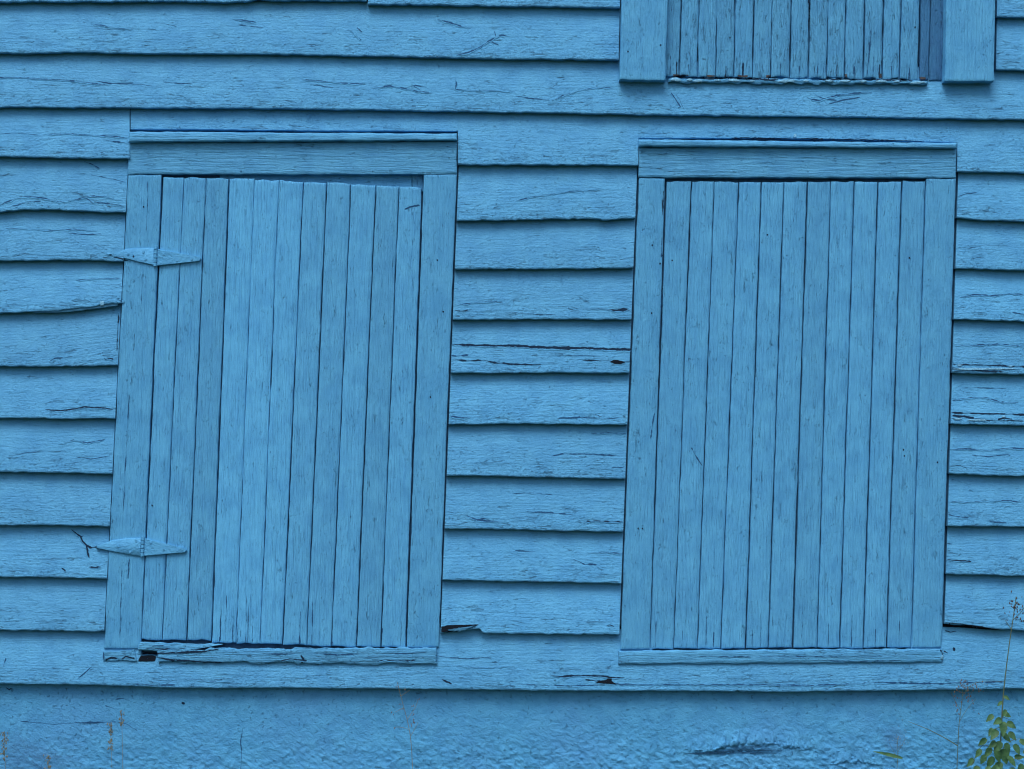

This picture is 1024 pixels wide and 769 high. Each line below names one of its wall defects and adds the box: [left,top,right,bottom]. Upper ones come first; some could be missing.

crack [451,344,631,365]
crack [62,529,130,631]
spalling [441,624,478,632]